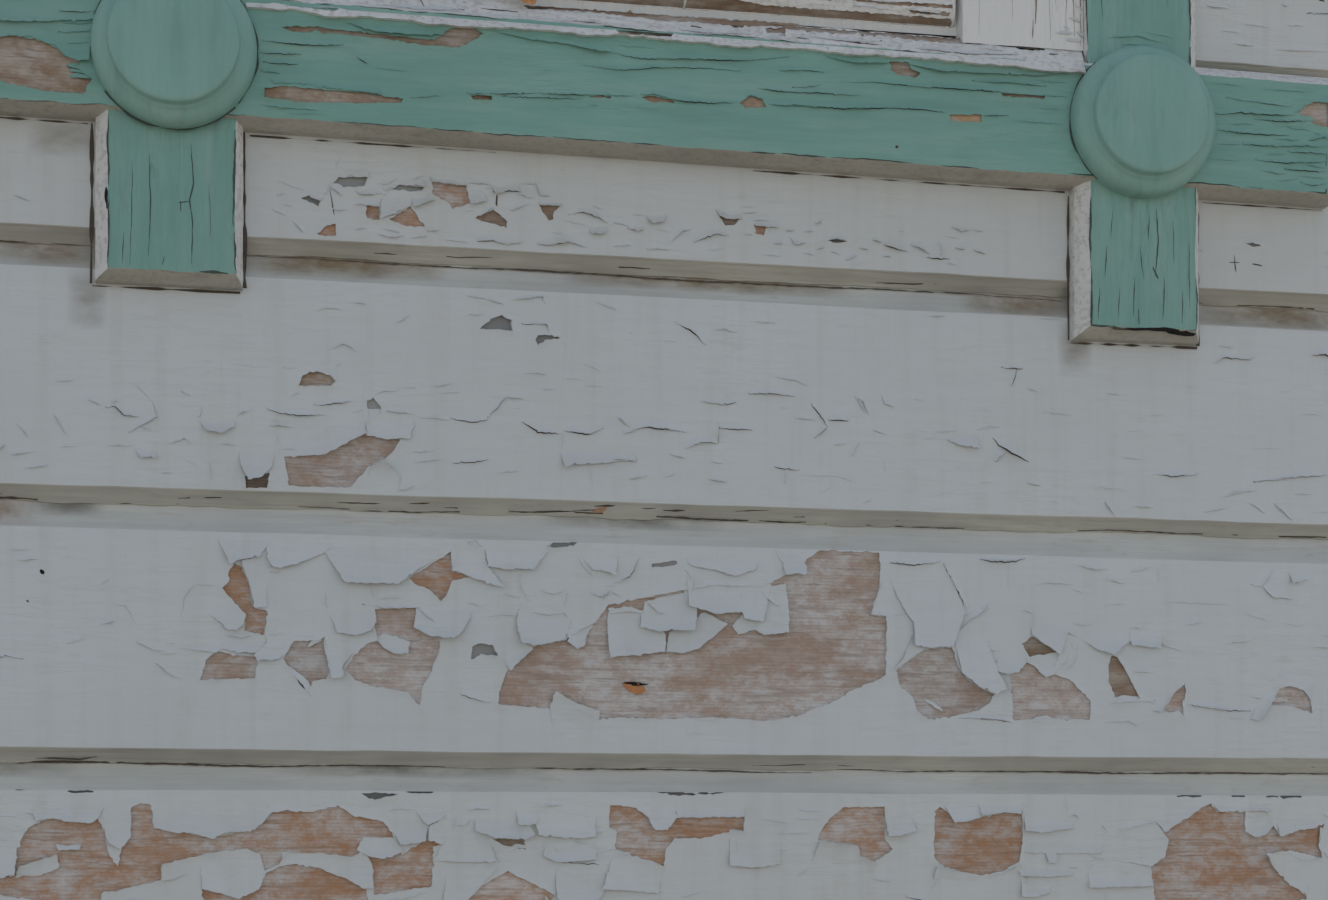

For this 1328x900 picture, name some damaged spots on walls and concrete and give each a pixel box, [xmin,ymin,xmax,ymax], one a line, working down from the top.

peeling [0,5,95,93]
peeling [283,7,614,51]
peeling [523,0,981,45]
peeling [366,177,521,227]
peeling [299,371,337,386]
peeling [239,398,414,489]
peeling [178,536,618,704]
peeling [471,548,1090,730]
peeling [1084,631,1163,697]
peeling [0,790,781,900]
peeling [812,807,917,876]
peeling [933,795,1326,900]